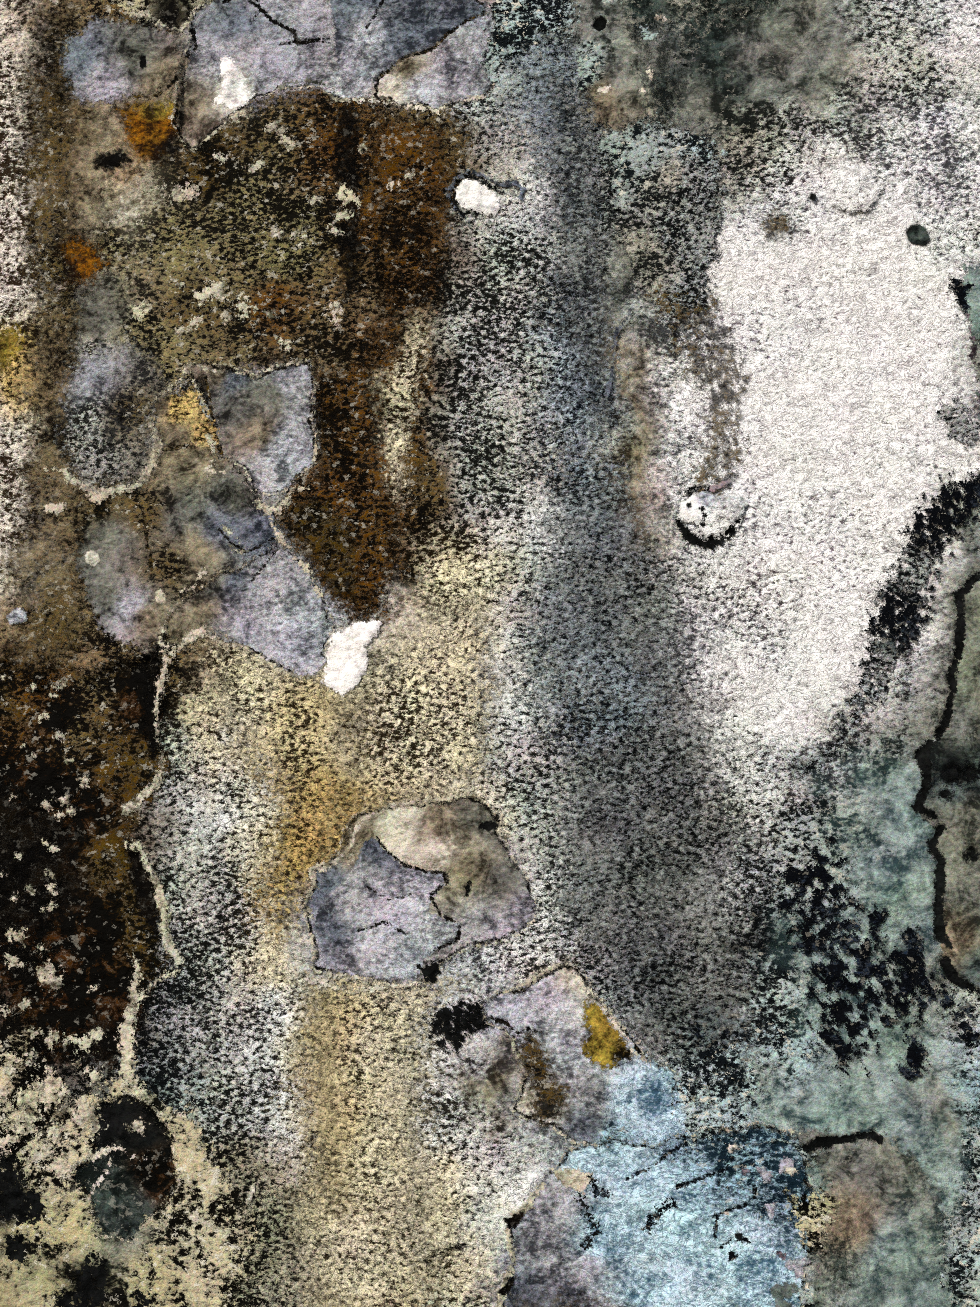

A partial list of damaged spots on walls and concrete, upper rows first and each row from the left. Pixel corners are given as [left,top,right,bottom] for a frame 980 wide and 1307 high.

rust [40,86,477,632]
flaking render [300,779,539,995]